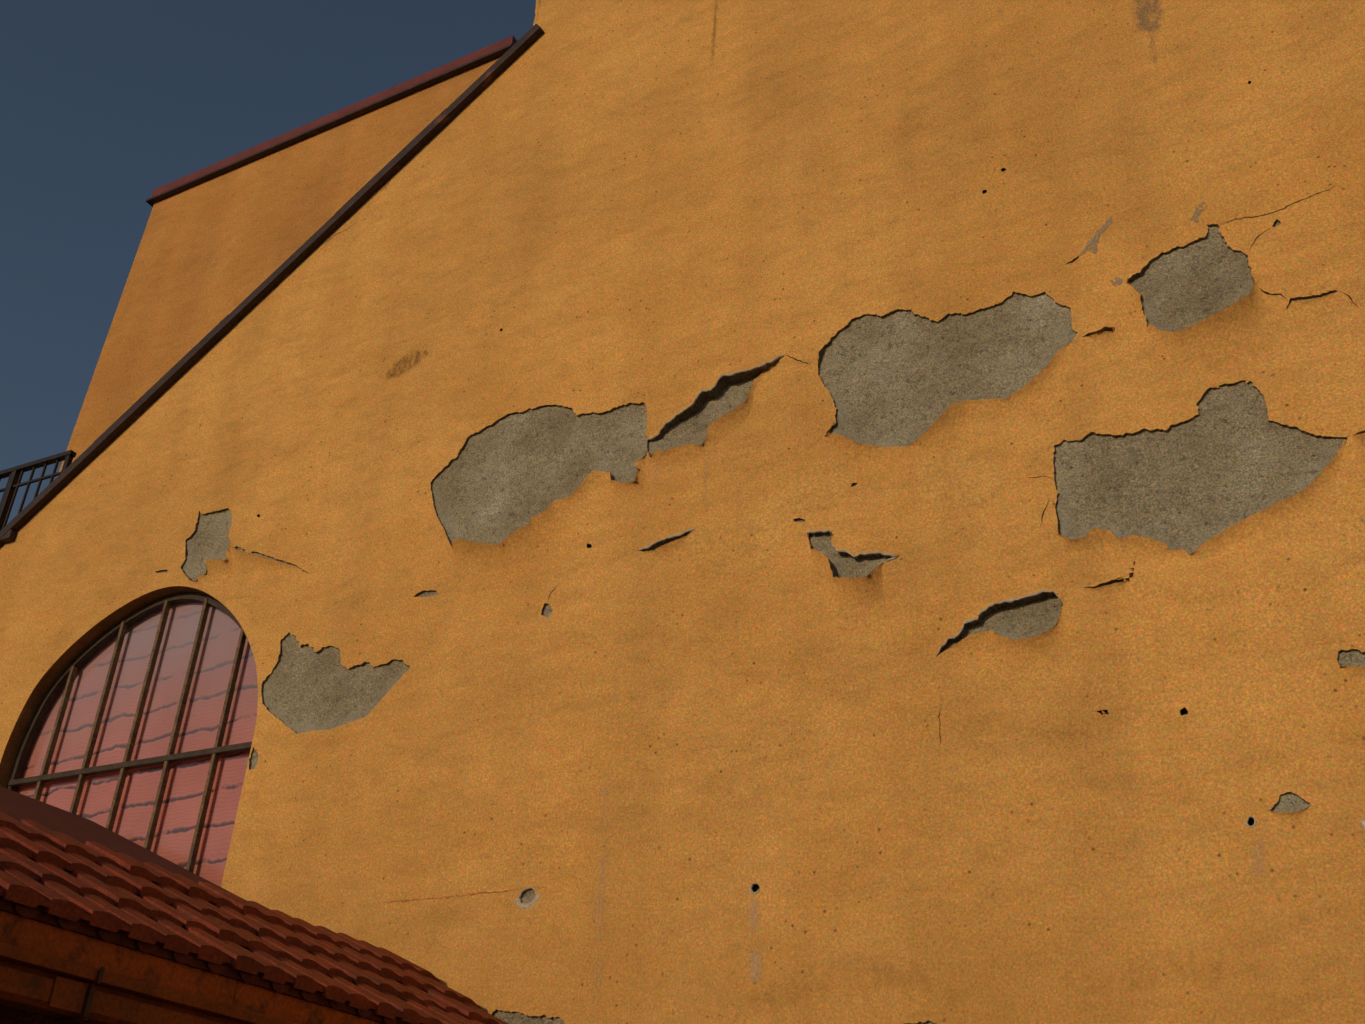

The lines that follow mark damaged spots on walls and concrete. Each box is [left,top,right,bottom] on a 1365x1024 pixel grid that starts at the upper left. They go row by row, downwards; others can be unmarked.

crack [1226,186,1335,247]
crack [1260,288,1361,312]
flaking render [811,292,1077,461]
flaking render [1049,202,1348,577]
flaking render [430,351,784,582]
flaking render [180,508,252,589]
crack [231,546,309,579]
flaking render [257,633,410,734]
flaking render [803,520,902,633]
flaking render [936,573,1068,672]
flaking render [1337,649,1365,688]
flaking render [491,1009,564,1024]